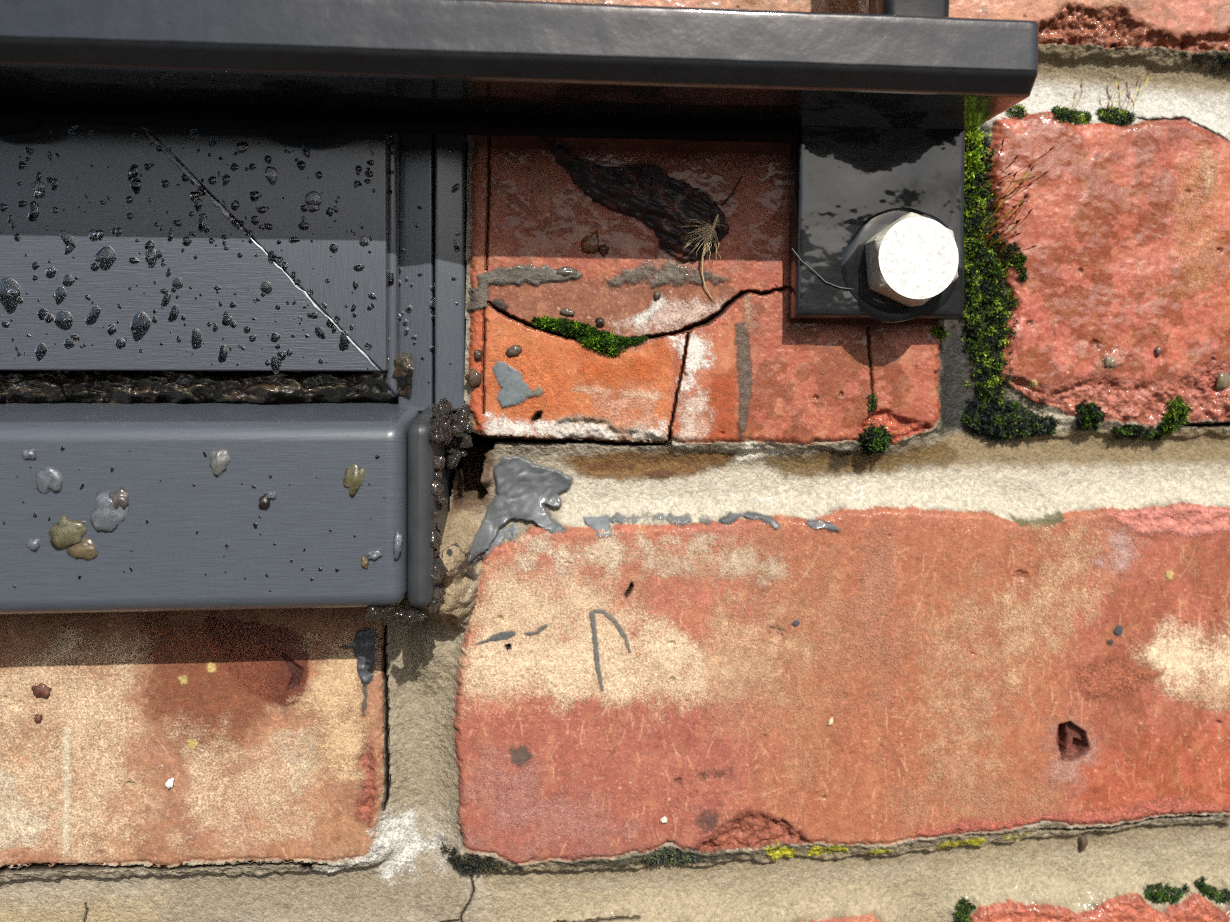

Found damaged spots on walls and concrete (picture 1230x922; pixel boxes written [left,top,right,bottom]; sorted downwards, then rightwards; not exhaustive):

spalling [1037,3,1230,53]
crack [484,136,492,270]
crack [476,287,788,447]
spalling [1057,721,1090,760]
water stain [464,745,640,860]
water stain [316,808,484,885]
spalling [697,808,813,852]
crack [440,873,475,922]
crack [556,914,640,922]